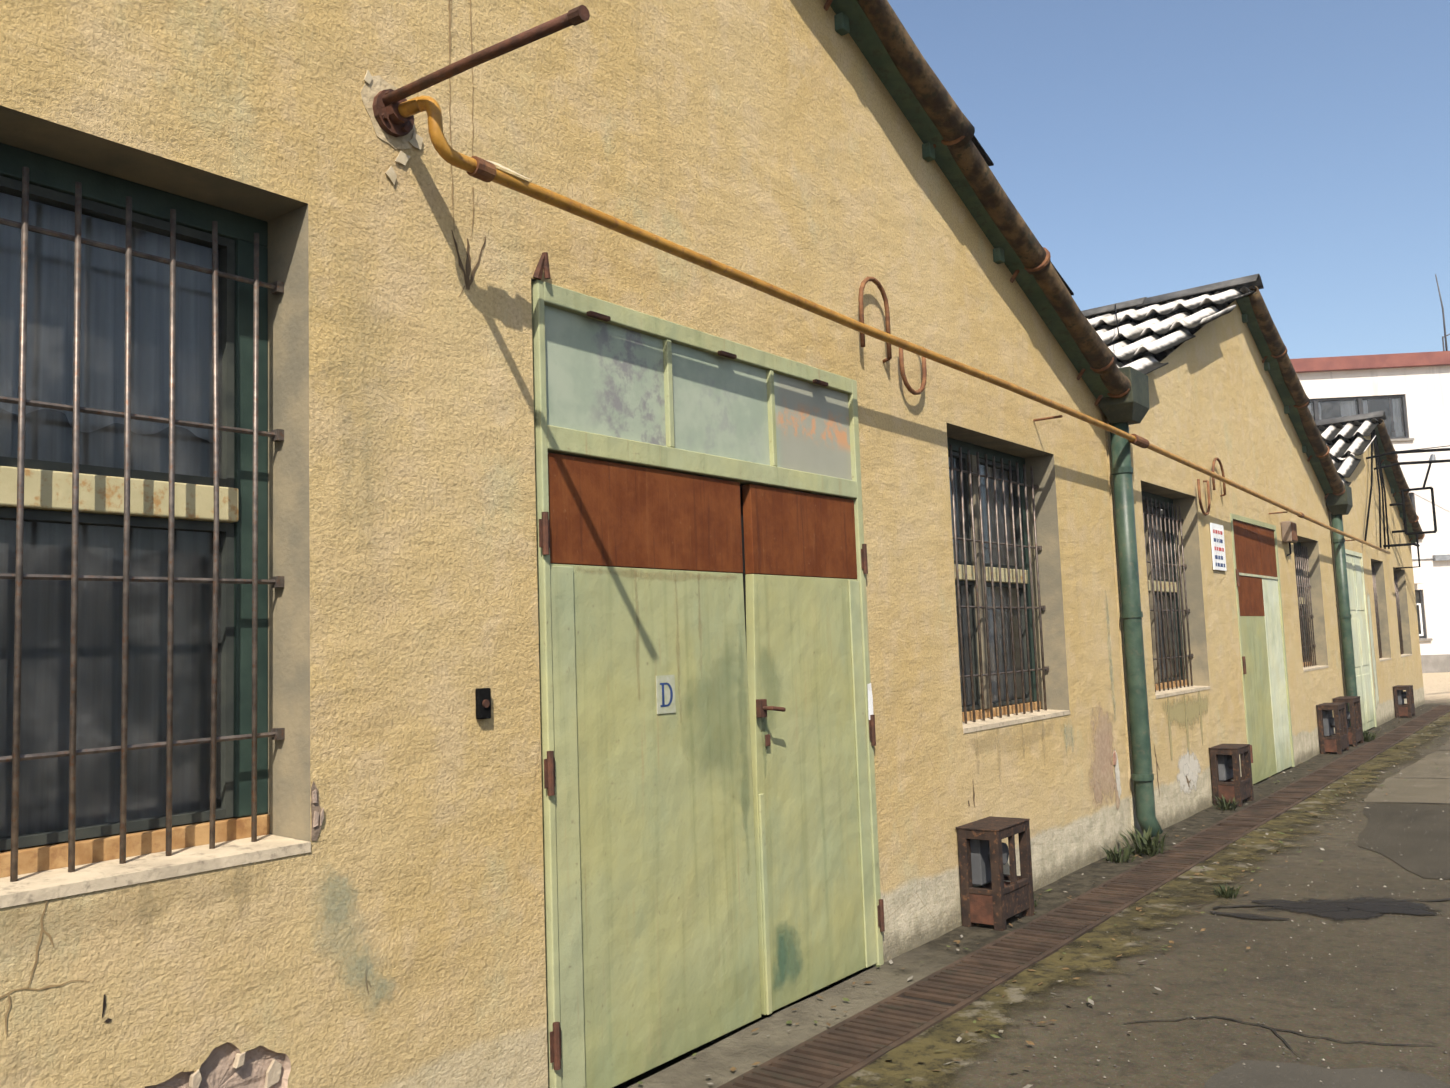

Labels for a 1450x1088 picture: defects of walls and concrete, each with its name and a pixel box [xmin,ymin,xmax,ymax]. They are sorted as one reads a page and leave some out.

flaking render [360,70,423,186]
flaking render [1090,710,1120,808]
crack [0,900,112,1034]
flaking render [145,1042,291,1088]